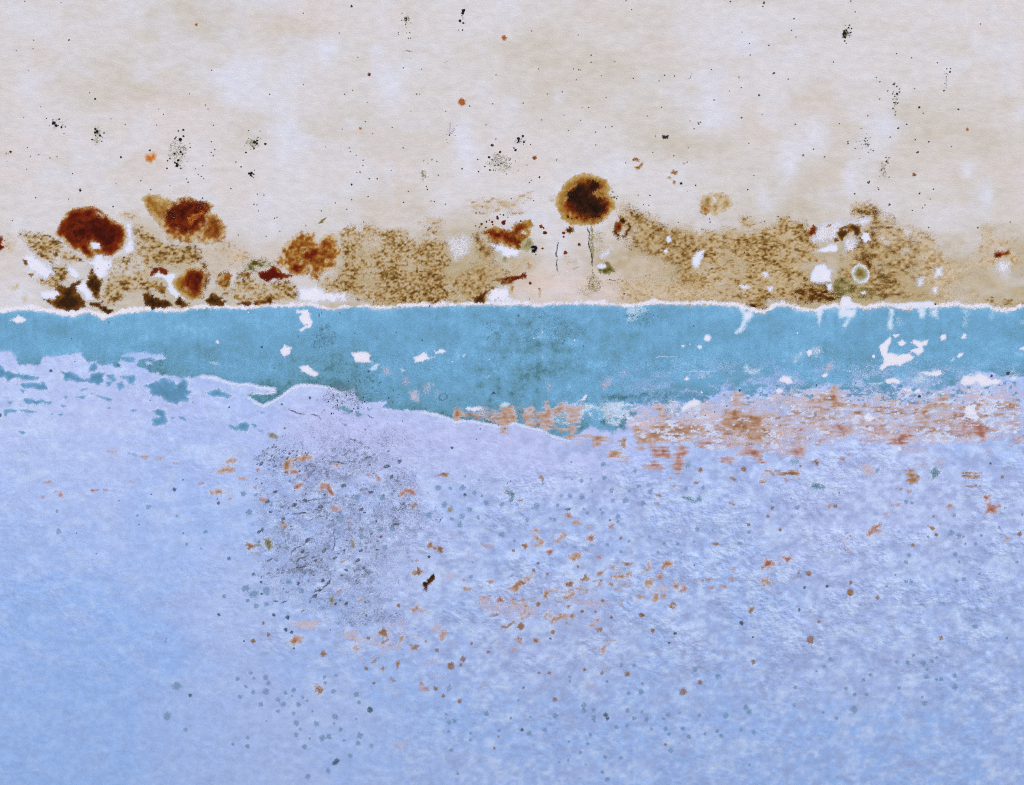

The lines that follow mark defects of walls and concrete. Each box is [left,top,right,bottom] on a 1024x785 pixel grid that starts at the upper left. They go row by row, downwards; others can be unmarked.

leakage [1,228,96,291]
corrosion [42,205,128,314]
corrosion [141,193,227,246]
leakage [100,207,299,307]
corrosion [142,230,343,310]
leakage [298,191,557,350]
corrosion [554,172,635,246]
leakage [581,199,1024,328]
peeling [0,361,372,439]
peeling [198,454,274,515]
peeling [279,451,395,549]
peeling [336,334,1024,765]